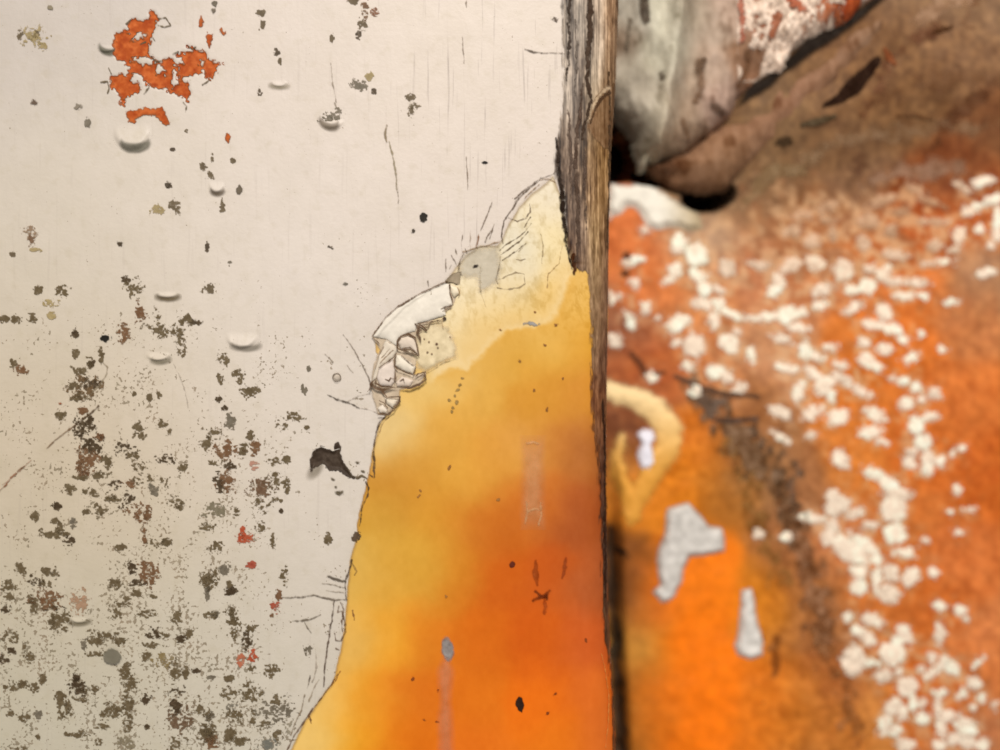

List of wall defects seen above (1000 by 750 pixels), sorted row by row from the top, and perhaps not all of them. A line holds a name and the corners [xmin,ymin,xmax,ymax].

peeling [607,176,1000,476]
peeling [30,177,613,750]
flaking render [653,503,725,603]
flaking render [735,589,763,659]
water stain [688,392,835,646]
water stain [762,635,780,677]